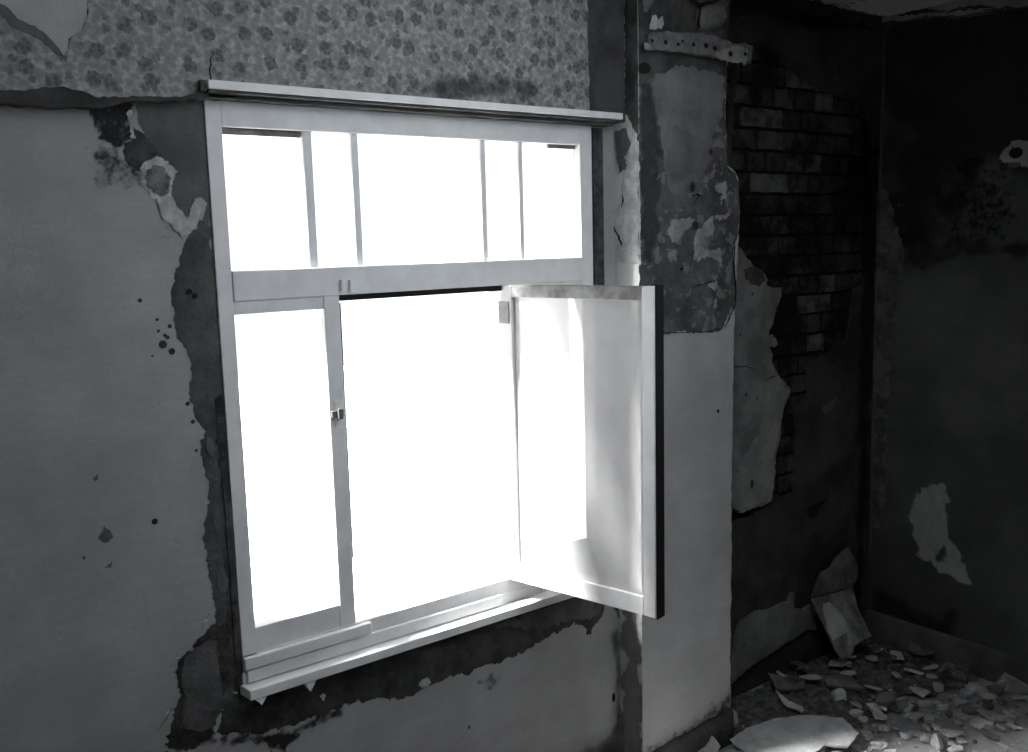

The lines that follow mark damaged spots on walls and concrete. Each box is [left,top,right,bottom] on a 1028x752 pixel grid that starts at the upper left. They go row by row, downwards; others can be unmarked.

flaking render [90,101,605,752]
flaking render [614,0,907,530]